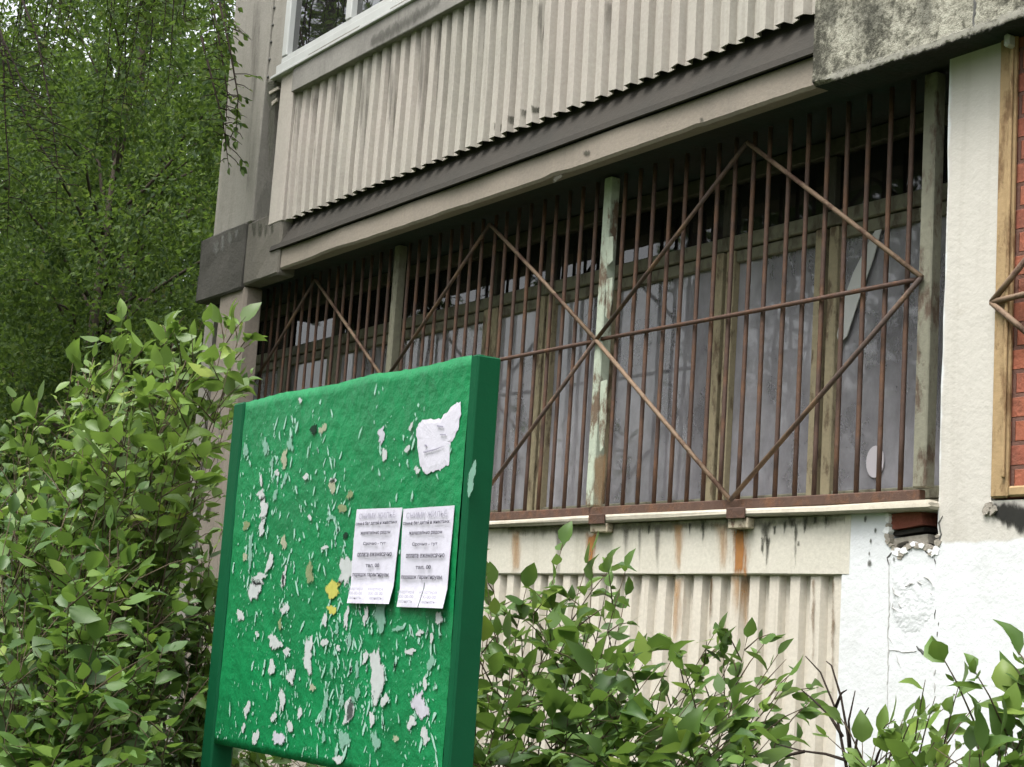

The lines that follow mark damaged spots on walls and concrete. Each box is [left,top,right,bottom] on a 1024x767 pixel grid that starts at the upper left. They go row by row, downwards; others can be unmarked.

peeling [604,236,614,319]
peeling [599,380,608,452]
corrosion [594,456,605,507]
damp [509,524,591,541]
damp [616,521,728,545]
corrosion [722,530,748,601]
damp [754,516,836,562]
spalling [882,512,943,565]
damp [989,503,1024,533]
crack [887,559,939,715]